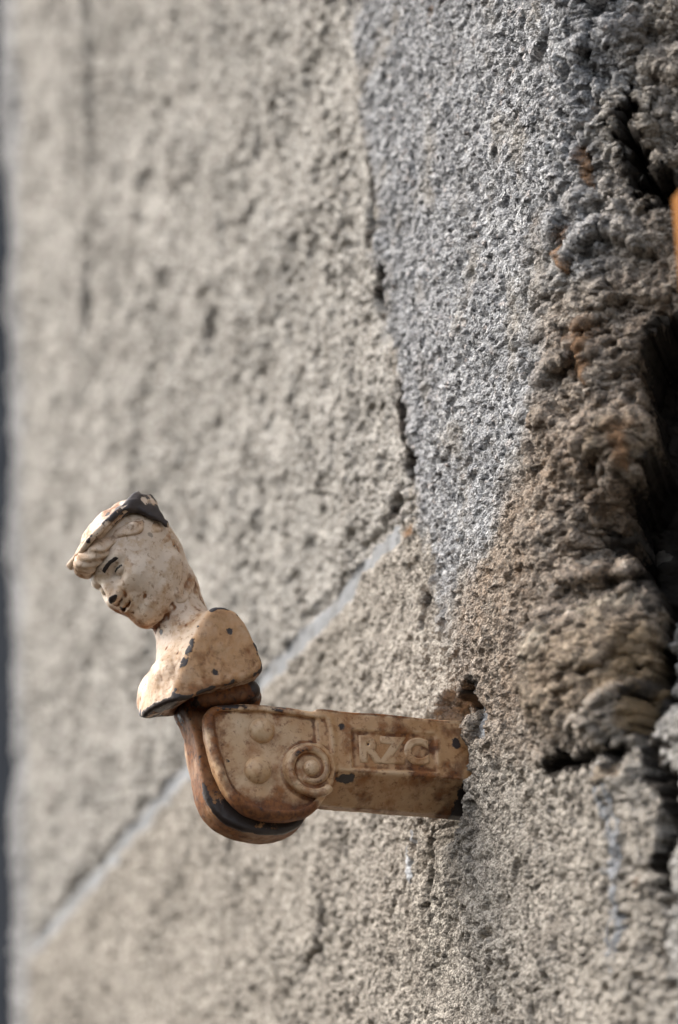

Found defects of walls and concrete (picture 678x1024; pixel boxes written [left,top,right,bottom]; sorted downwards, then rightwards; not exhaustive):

spalling [575,530,674,567]
spalling [459,674,488,736]